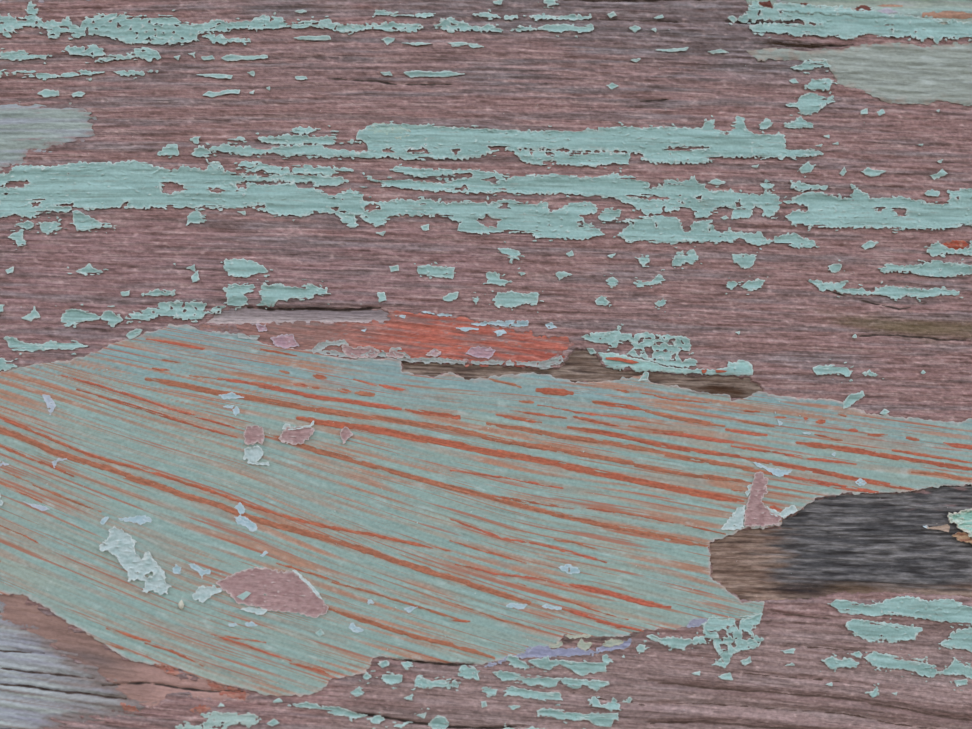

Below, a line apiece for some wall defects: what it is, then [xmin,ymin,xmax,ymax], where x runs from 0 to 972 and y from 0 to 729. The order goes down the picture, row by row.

peeling [0,0,594,98]
peeling [727,0,972,44]
peeling [0,59,972,339]
peeling [0,336,88,371]
spalling [312,324,764,399]
peeling [812,359,884,382]
peeling [243,425,270,466]
peeling [234,502,258,532]
peeling [99,515,329,627]
peeling [710,462,972,691]
peeling [0,601,155,729]
peeling [273,613,764,729]